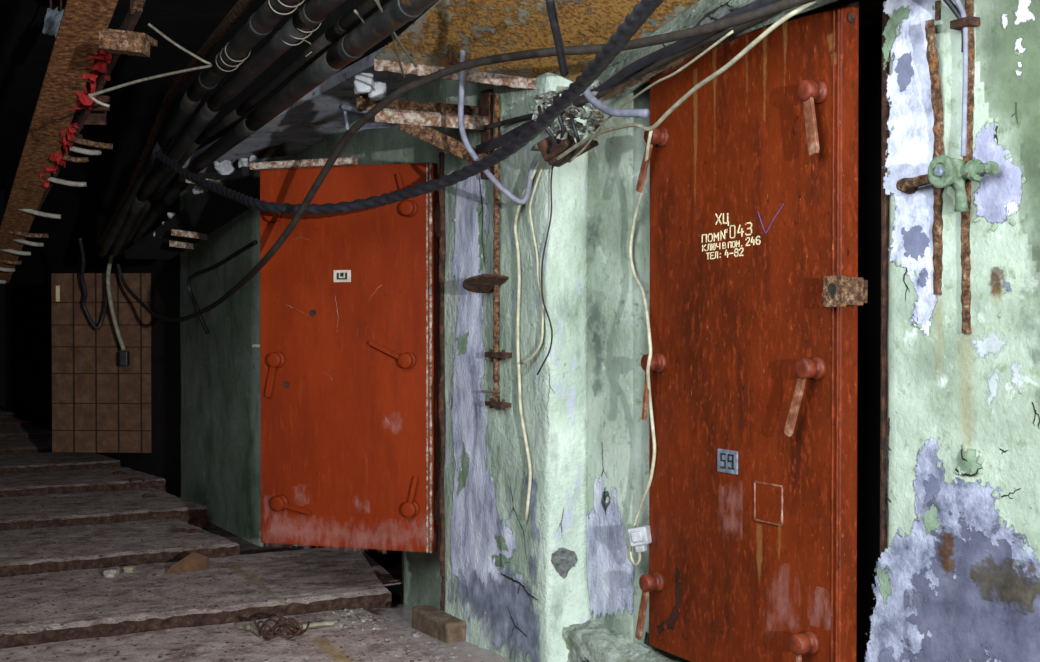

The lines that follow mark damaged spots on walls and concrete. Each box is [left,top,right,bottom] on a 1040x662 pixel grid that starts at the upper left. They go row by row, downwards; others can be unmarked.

corrosion [382,0,641,80]
corrosion [630,0,700,40]
corrosion [925,19,944,159]
corrosion [963,0,974,163]
peeling [1001,0,1035,28]
peeling [882,0,943,336]
corrosion [932,186,944,294]
corrosion [960,179,972,333]
peeling [972,117,1026,231]
peeling [449,173,523,604]
peeling [551,476,634,619]
peeling [864,436,1040,662]